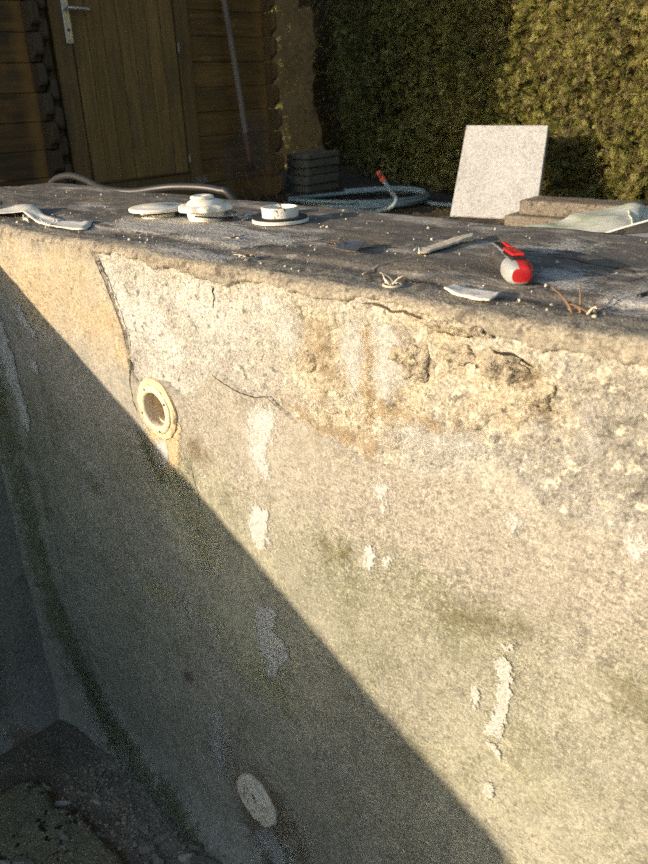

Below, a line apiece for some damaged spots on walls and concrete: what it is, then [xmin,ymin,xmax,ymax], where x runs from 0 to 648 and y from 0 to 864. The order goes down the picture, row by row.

leakage [0,319,198,845]
crack [94,258,138,414]
corrosion [141,423,181,478]
leakage [248,504,271,550]
leakage [244,404,276,479]
spalling [94,252,648,532]